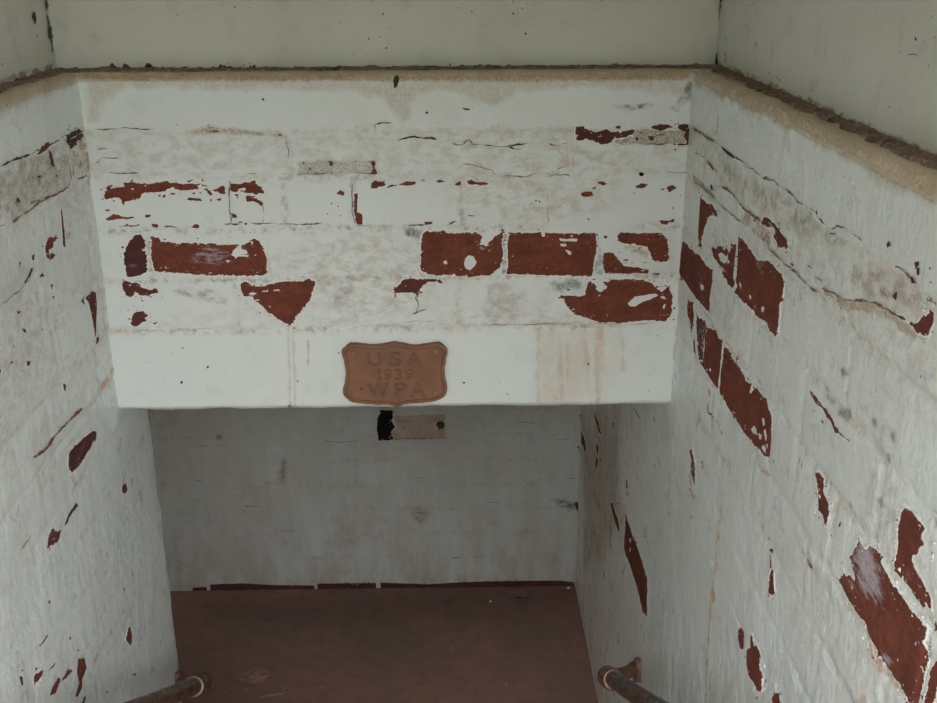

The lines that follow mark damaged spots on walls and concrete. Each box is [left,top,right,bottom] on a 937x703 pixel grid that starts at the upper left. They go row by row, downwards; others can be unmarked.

crack [0,127,150,227]
peeling [99,176,319,329]
crack [225,173,320,225]
peeling [570,120,689,150]
crack [669,128,911,326]
peeling [389,180,791,473]
peeling [67,416,100,482]
peeling [46,503,78,556]
peeling [610,500,648,617]
peeling [813,470,841,536]
peeling [835,495,937,703]
peeling [736,624,783,703]